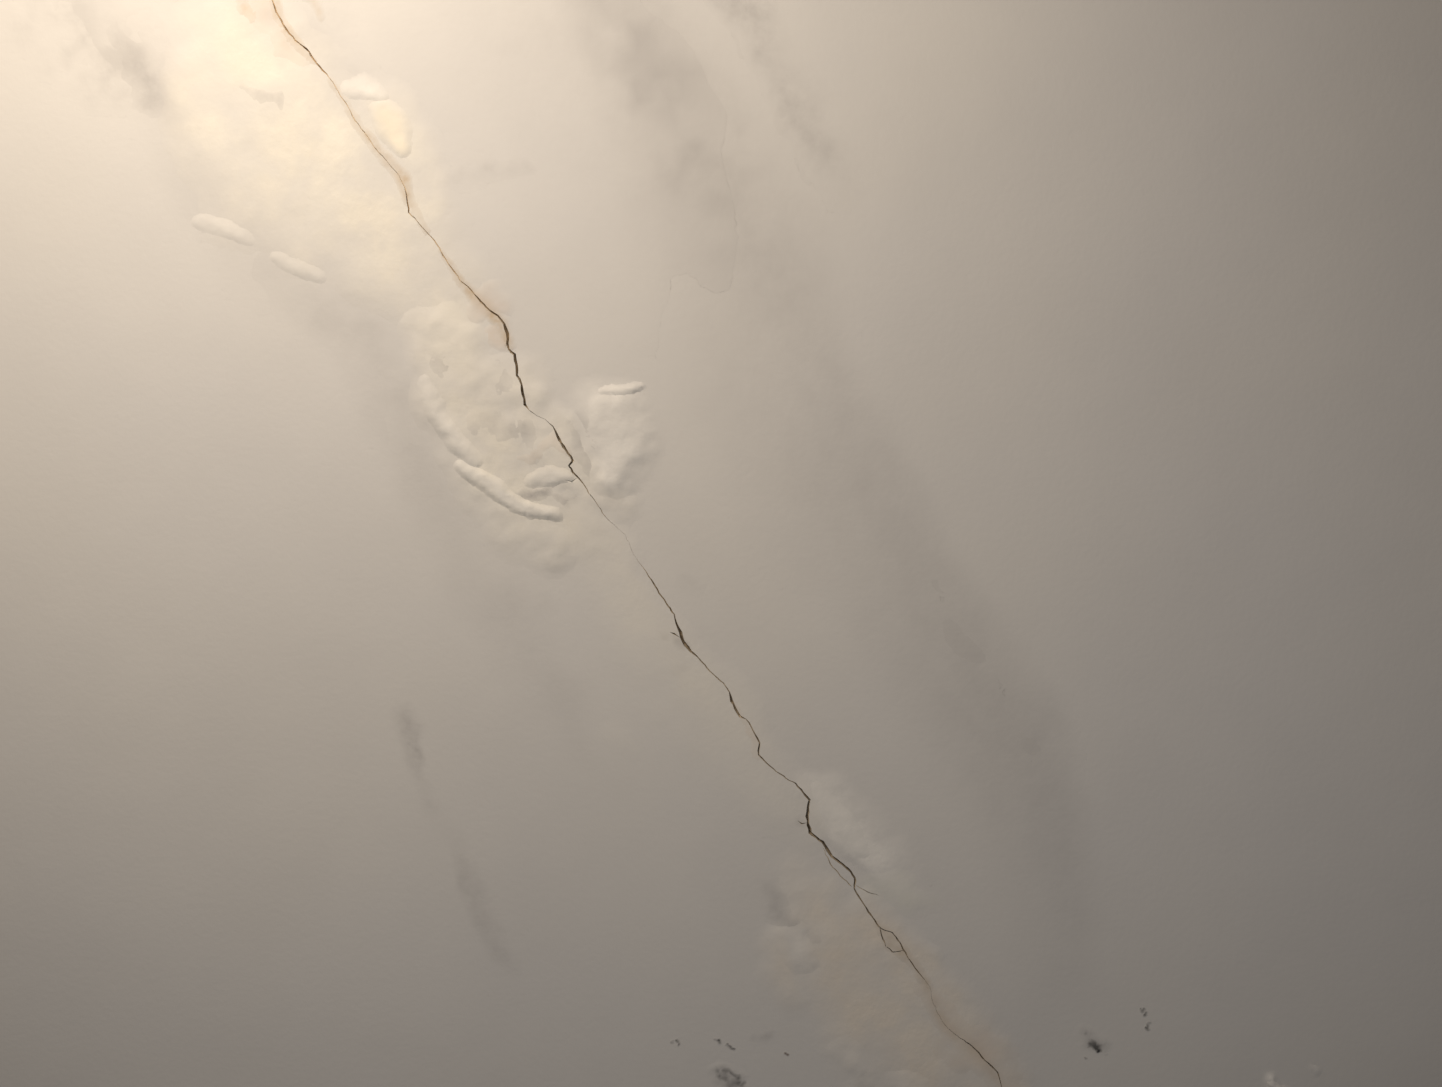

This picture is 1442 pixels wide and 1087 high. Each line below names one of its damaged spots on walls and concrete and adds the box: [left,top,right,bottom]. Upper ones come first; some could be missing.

leakage [0,0,829,858]
crack [272,0,1002,1087]
leakage [296,0,1117,1060]
leakage [706,1023,790,1087]